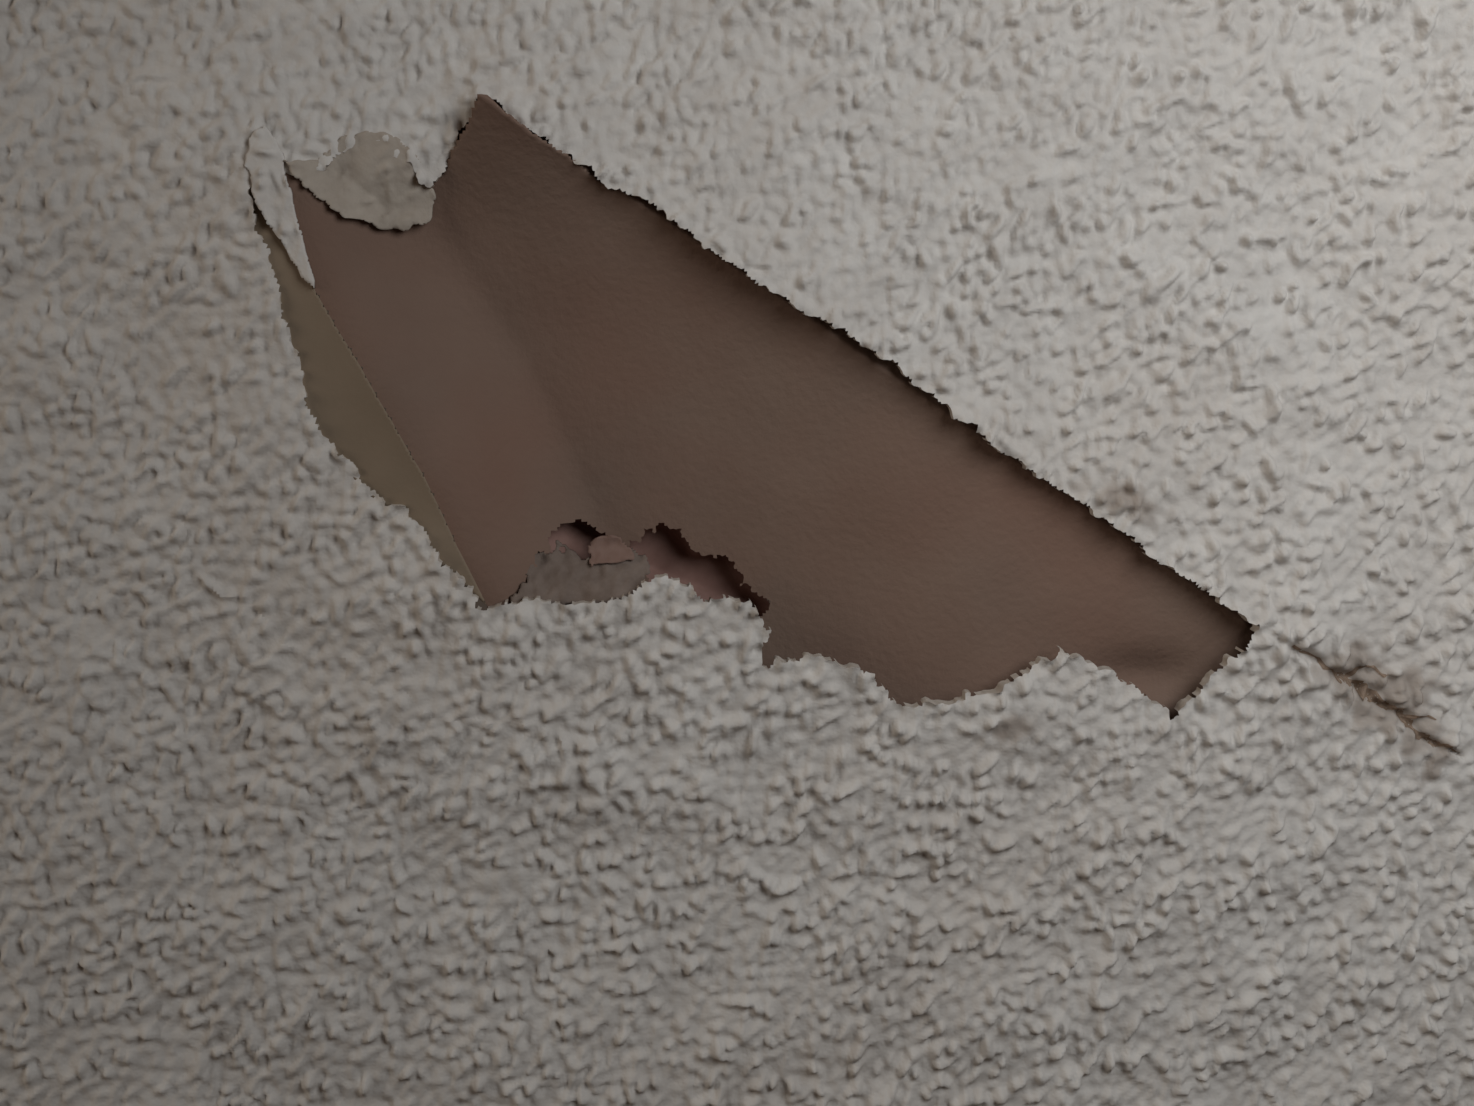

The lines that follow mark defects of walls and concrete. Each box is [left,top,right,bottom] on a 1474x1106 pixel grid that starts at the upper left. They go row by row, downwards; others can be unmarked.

peeling [245,94,1260,720]
crack [1292,645,1462,754]